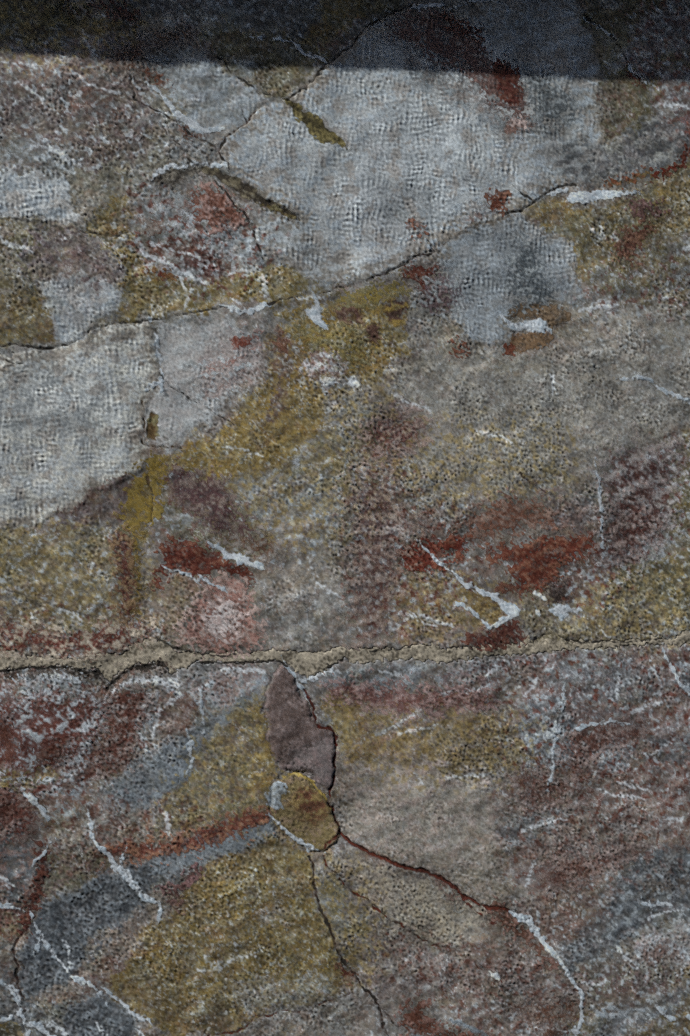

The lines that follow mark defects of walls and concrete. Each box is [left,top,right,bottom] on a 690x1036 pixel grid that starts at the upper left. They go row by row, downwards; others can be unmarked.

crack [129,5,412,259]
crack [505,183,577,215]
crack [371,240,432,279]
crack [2,306,223,364]
crack [0,639,288,692]
crack [558,635,667,643]
crack [207,689,514,1036]